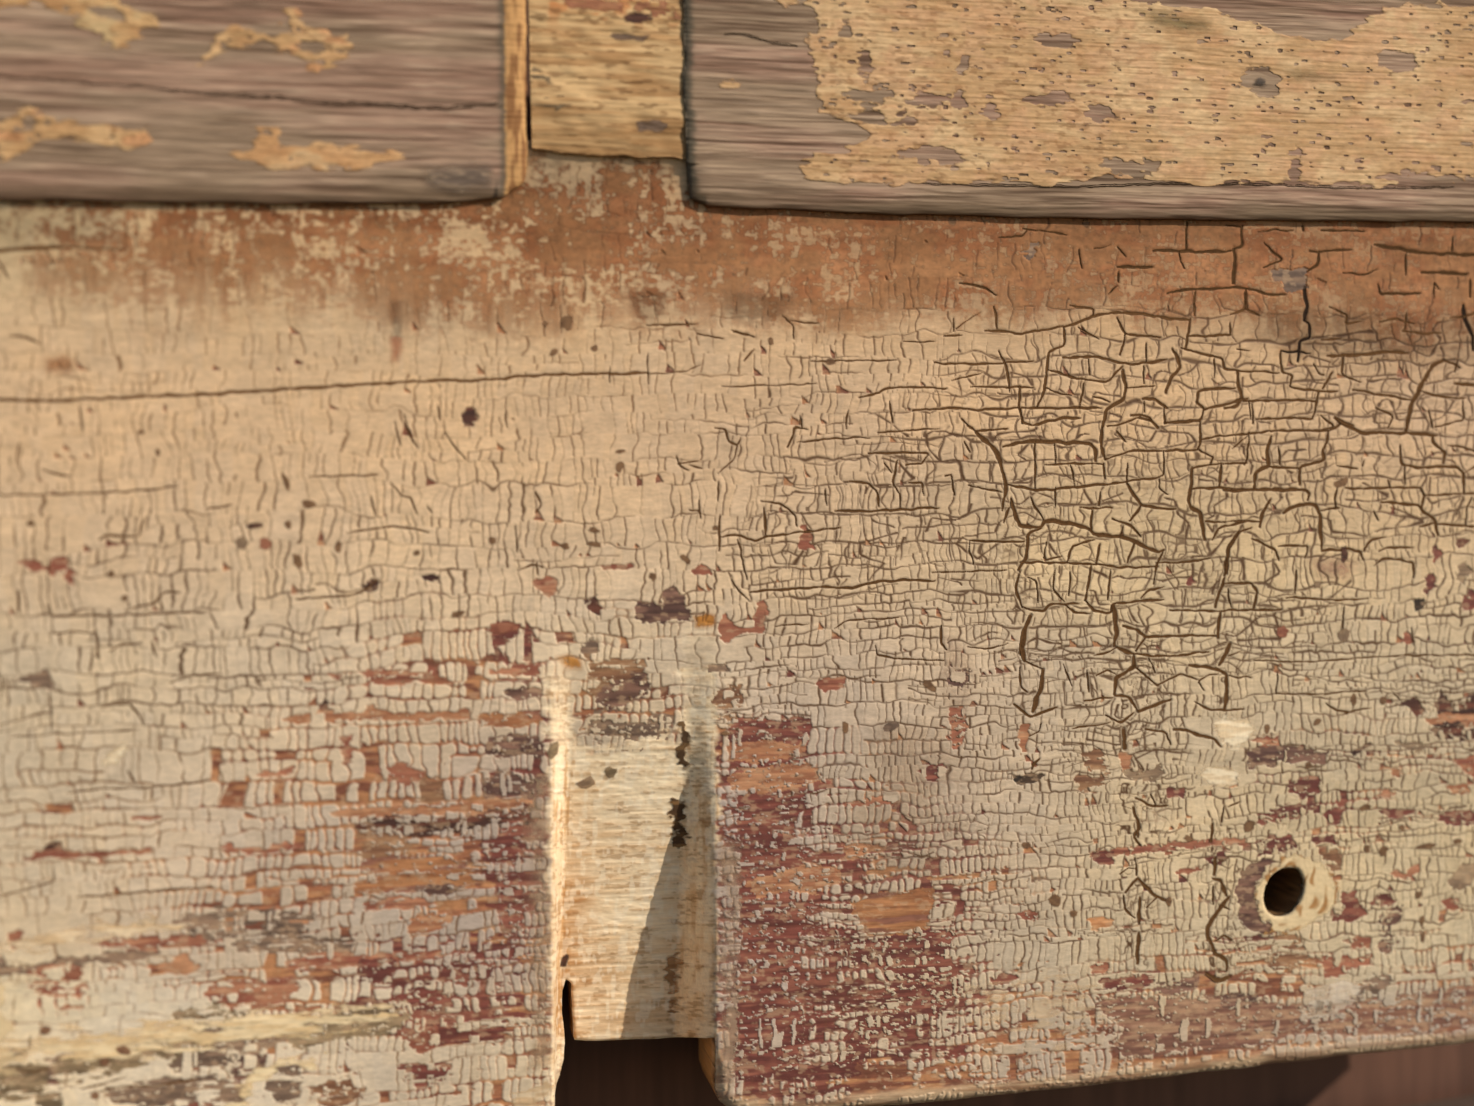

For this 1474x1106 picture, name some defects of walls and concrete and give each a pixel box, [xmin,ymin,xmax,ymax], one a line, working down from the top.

peeling [777,0,1474,190]
crack [921,181,1454,189]
crack [0,222,1474,769]
peeling [488,621,520,649]
crack [0,869,212,898]
crack [68,771,211,794]
peeling [0,664,559,1106]
peeling [708,665,846,1080]
peeling [834,890,960,1065]
crack [1120,794,1167,964]
crack [1205,801,1240,983]
peeling [1074,691,1474,1057]